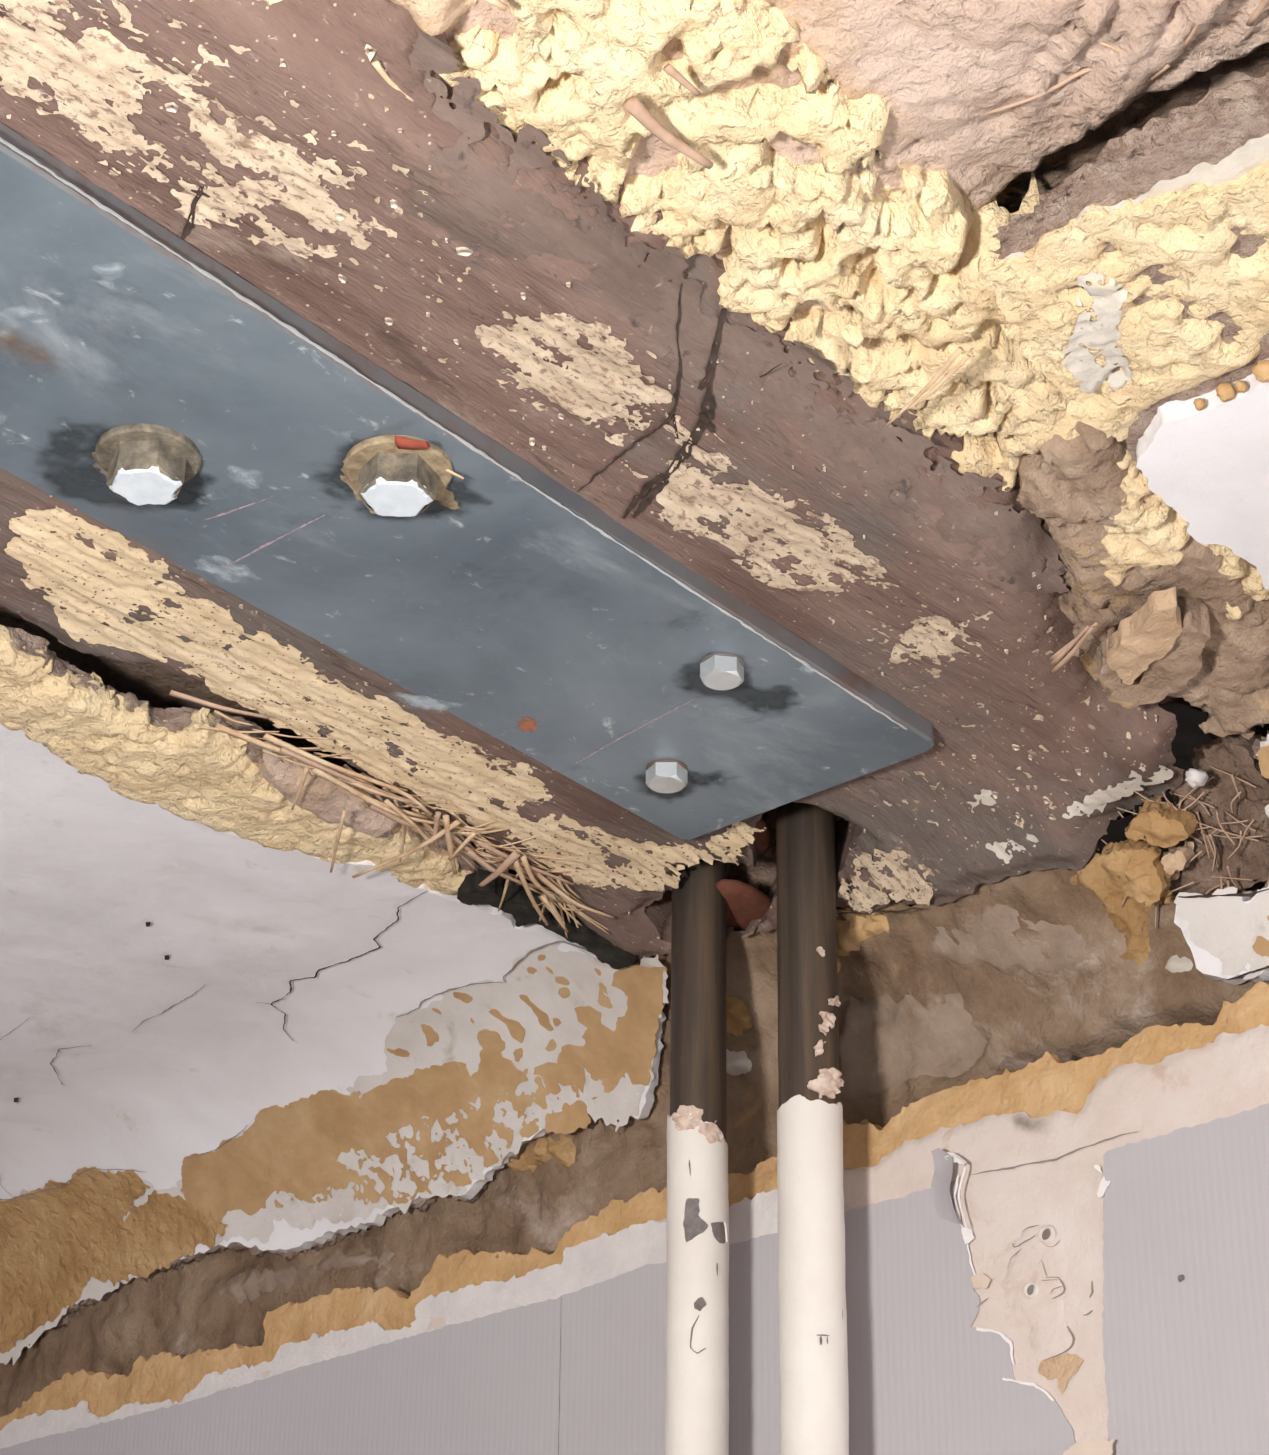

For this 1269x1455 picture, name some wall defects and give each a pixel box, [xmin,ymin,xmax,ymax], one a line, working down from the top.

peeling [0,0,372,265]
crack [577,283,727,519]
flaking render [439,0,1269,897]
peeling [0,506,766,895]
peeling [0,941,667,1353]
flaking render [0,1187,667,1431]
crack [258,891,427,1037]
peeling [671,1105,723,1144]
flaking render [684,1157,778,1243]
peeling [807,995,844,1099]
peeling [838,848,935,914]
flaking render [843,981,1269,1170]